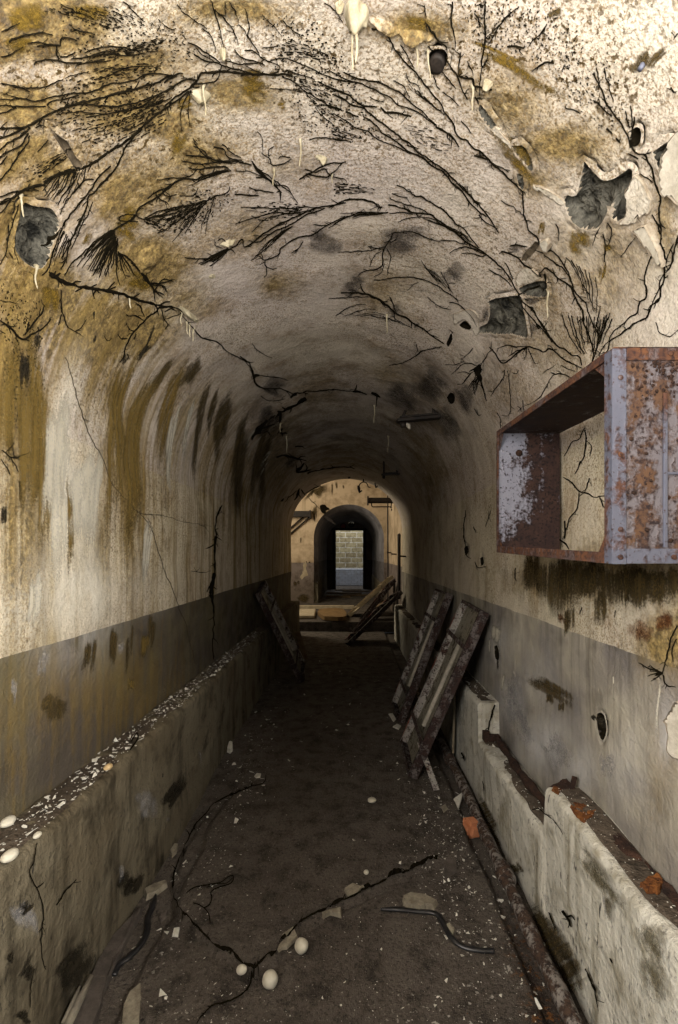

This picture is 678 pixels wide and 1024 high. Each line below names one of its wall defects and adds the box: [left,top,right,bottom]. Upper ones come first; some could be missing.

leakage [54,5,212,146]
spalling [6,196,66,277]
crack [0,0,678,510]
spalling [446,237,552,348]
spalling [473,99,678,268]
leakage [0,283,279,580]
crack [65,357,222,664]
crack [560,428,604,549]
leakage [523,555,678,633]
leakage [530,679,571,710]
flaking render [663,701,678,759]
crack [172,776,438,1023]